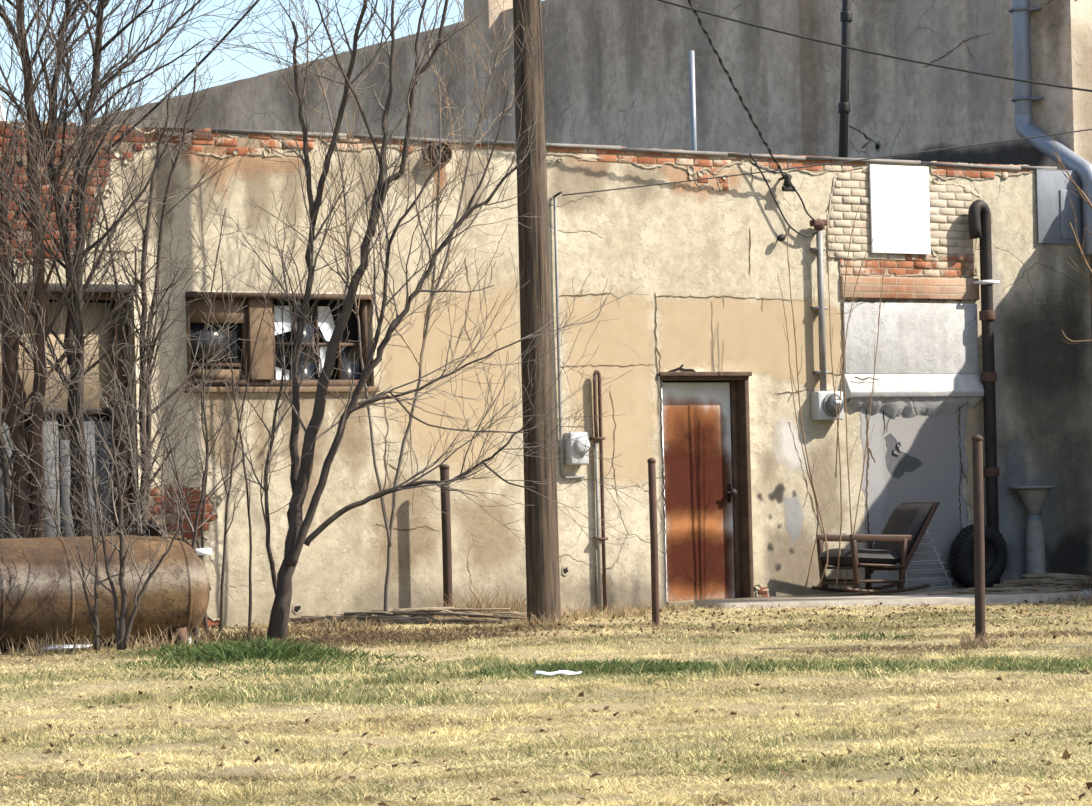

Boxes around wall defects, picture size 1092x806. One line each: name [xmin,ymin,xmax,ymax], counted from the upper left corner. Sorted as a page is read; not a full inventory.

crack [923,33,989,68]
flaking render [0,121,515,266]
flaking render [546,147,1032,278]
flaking render [150,482,222,542]
corrosion [663,401,731,601]
spalling [885,433,922,479]